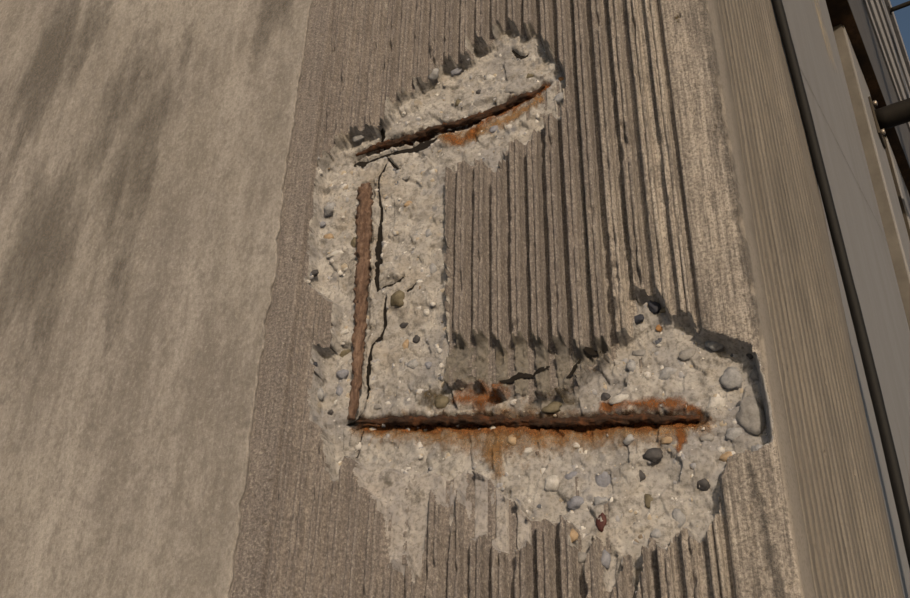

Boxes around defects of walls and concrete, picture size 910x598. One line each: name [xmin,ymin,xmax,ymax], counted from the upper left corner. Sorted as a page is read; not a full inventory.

corrosion [356,82,550,157]
crack [347,157,416,458]
corrosion [347,182,711,476]
spalling [304,17,774,593]
crack [499,347,601,383]